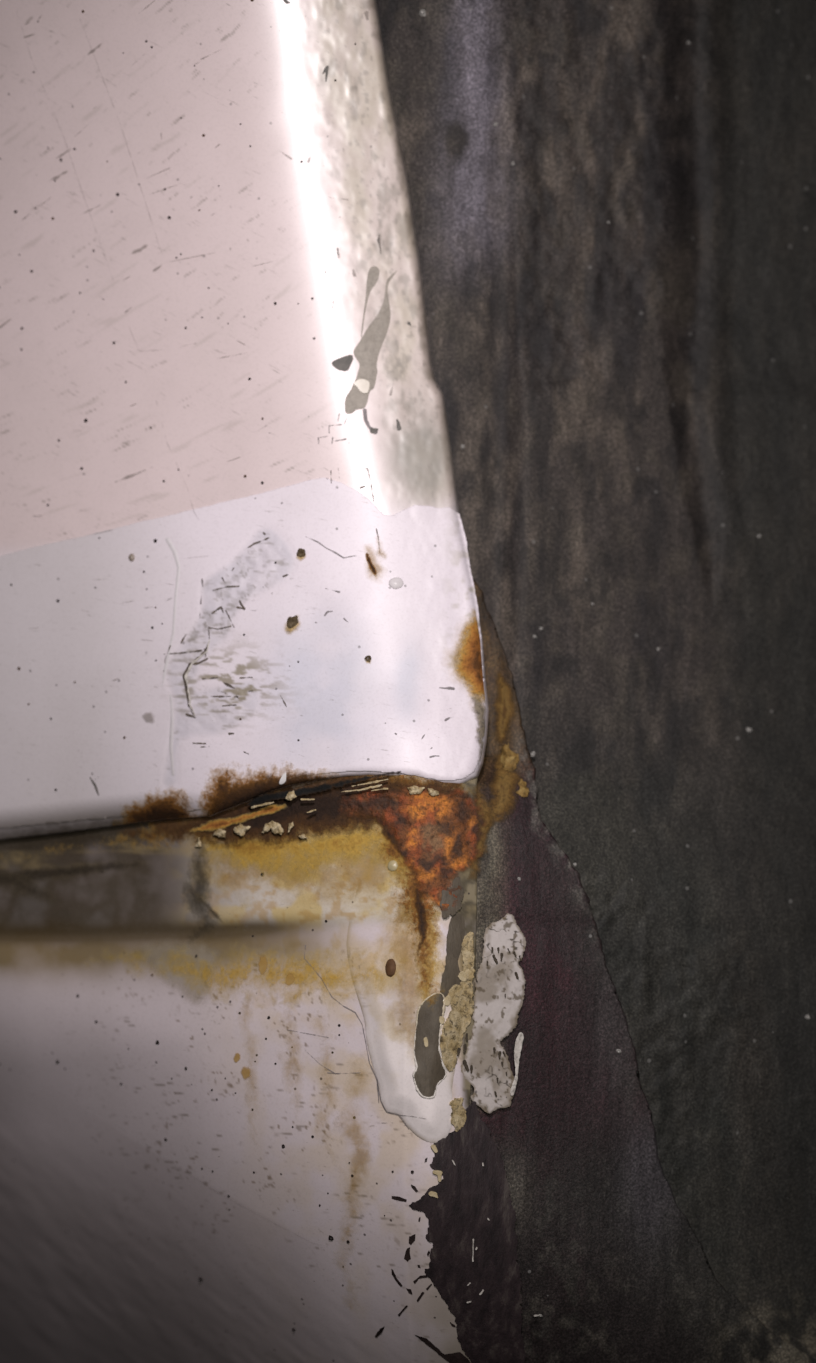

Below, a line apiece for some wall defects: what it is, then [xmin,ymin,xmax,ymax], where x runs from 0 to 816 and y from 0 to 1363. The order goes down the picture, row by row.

peeling [332,237,397,434]
crack [163,532,288,754]
water stain [0,863,137,894]
water stain [189,861,218,920]
water stain [147,947,378,998]
corrosion [113,617,520,1003]
peeling [391,912,540,1363]